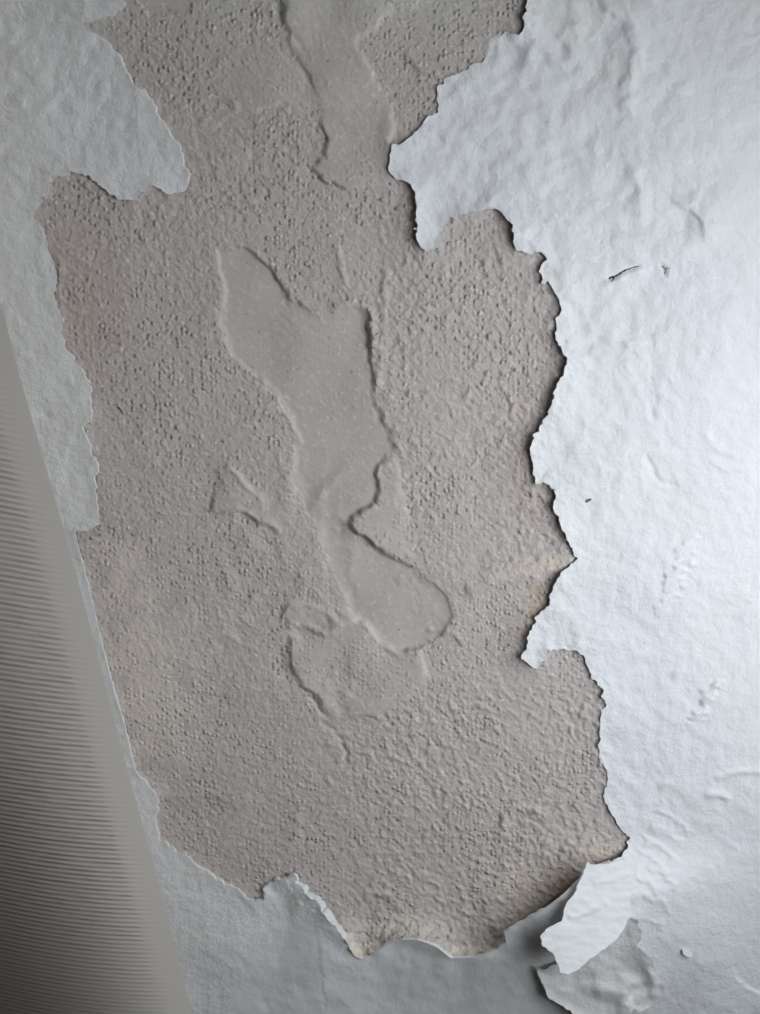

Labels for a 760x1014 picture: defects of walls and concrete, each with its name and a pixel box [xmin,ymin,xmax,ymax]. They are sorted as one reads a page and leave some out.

peeling [0,0,641,960]
peeling [535,850,664,1014]